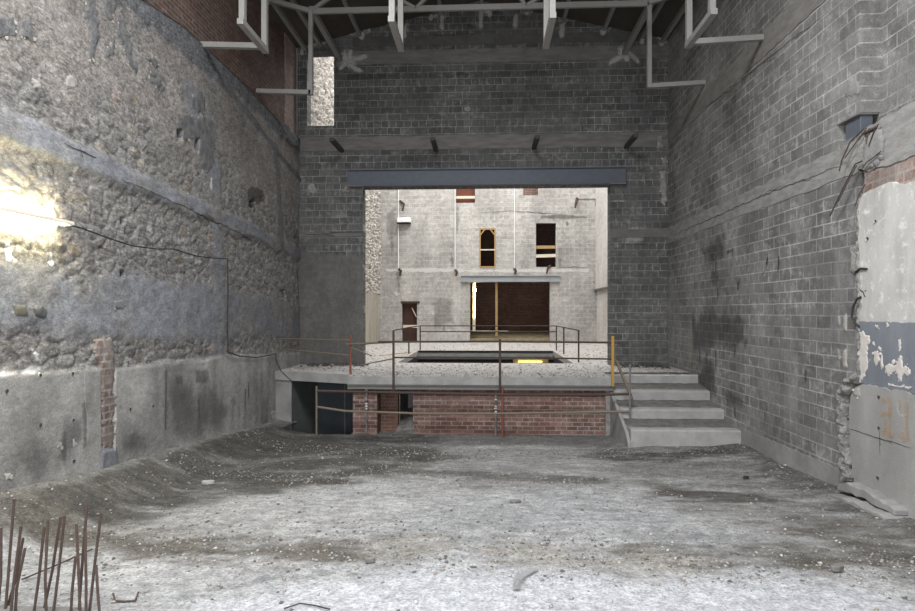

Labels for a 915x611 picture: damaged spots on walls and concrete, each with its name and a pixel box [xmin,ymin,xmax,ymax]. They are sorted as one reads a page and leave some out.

crack [674,162,847,235]
spalling [93,336,118,469]
spalling [834,198,912,484]